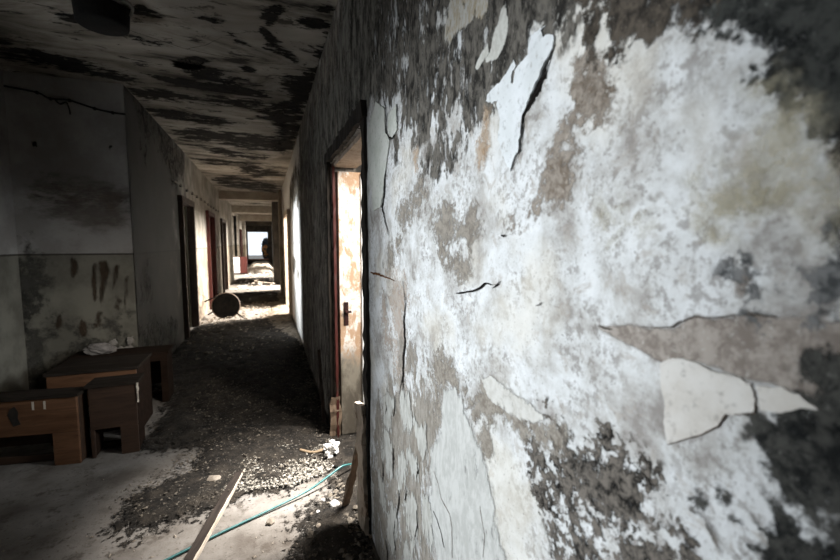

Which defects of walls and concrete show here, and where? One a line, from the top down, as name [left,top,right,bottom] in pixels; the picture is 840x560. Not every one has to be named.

damp [0,3,335,193]
crack [382,95,398,139]
peeling [475,5,508,70]
peeling [485,25,555,171]
crack [511,45,554,169]
crack [380,172,388,232]
damp [18,244,127,390]
crack [456,281,500,294]
spalling [600,315,840,444]
damp [427,344,719,560]